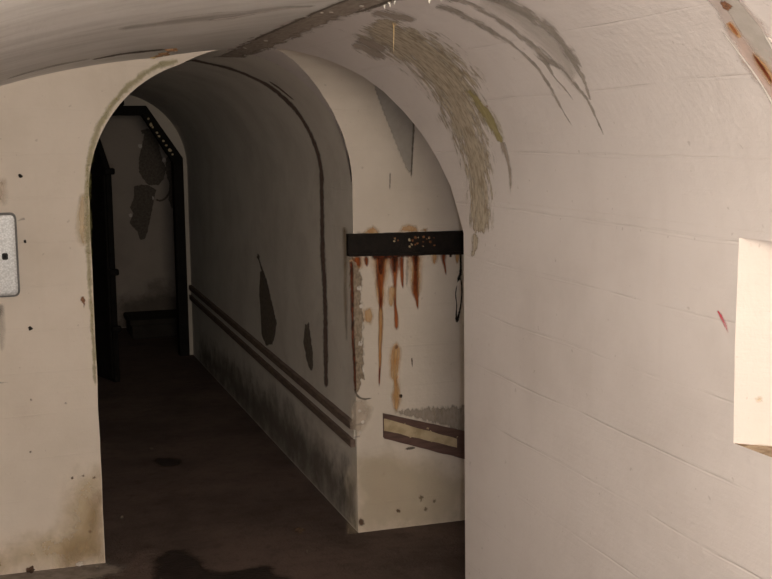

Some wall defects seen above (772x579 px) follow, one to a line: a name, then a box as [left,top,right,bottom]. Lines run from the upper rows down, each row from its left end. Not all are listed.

peeling [709,0,772,105]
spalling [349,258,372,400]
corrosion [354,256,419,384]
corrosion [391,345,399,409]